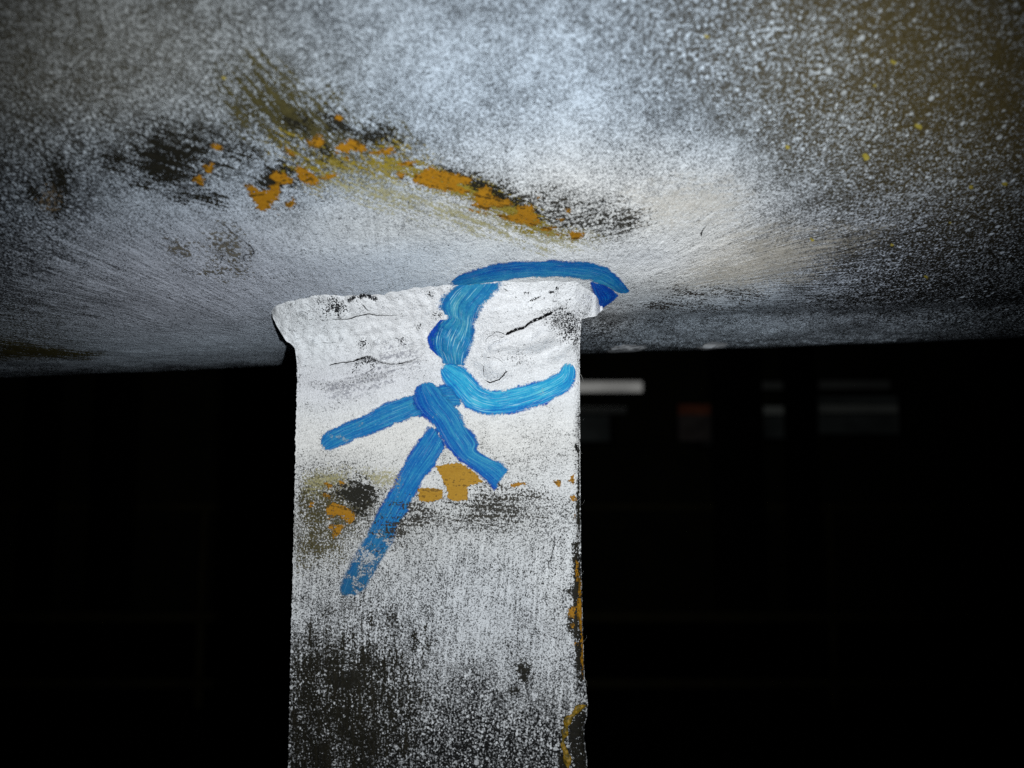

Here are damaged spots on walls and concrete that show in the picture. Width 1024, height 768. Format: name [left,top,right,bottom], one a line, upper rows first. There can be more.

damp [91,139,229,213]
crack [307,304,420,372]
crack [483,312,553,383]
damp [341,594,427,688]